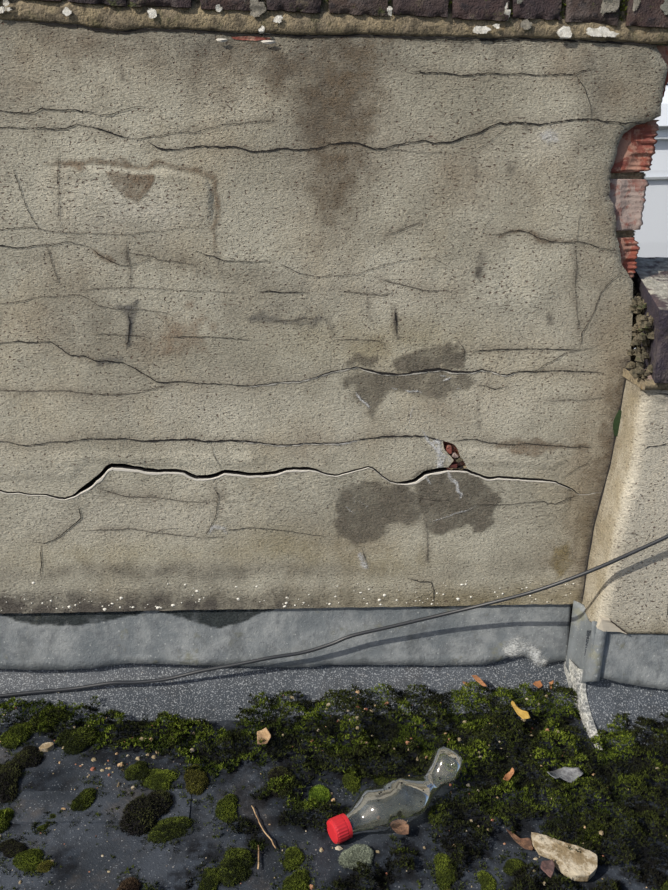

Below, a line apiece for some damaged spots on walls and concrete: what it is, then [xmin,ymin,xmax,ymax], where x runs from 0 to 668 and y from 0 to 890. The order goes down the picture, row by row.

crack [30,22,668,46]
crack [0,68,647,395]
flaking render [609,120,659,278]
damp [344,344,471,413]
crack [0,361,630,602]
damp [335,438,500,544]
spalling [443,441,467,470]
damp [1,611,142,625]
damp [159,609,274,628]